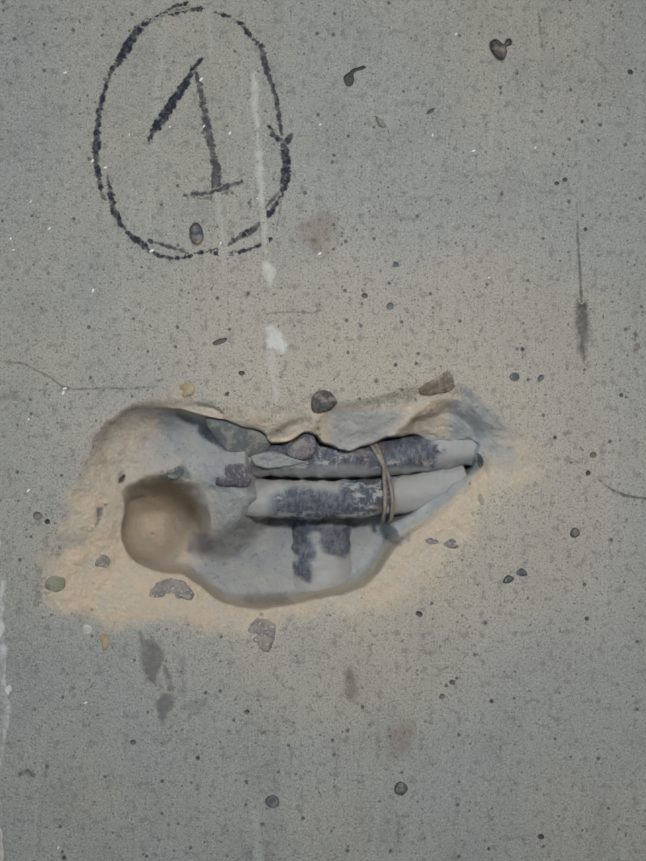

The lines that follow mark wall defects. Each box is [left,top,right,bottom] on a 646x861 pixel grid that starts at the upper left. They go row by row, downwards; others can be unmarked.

spalling [28,363,553,652]
crack [597,478,646,501]